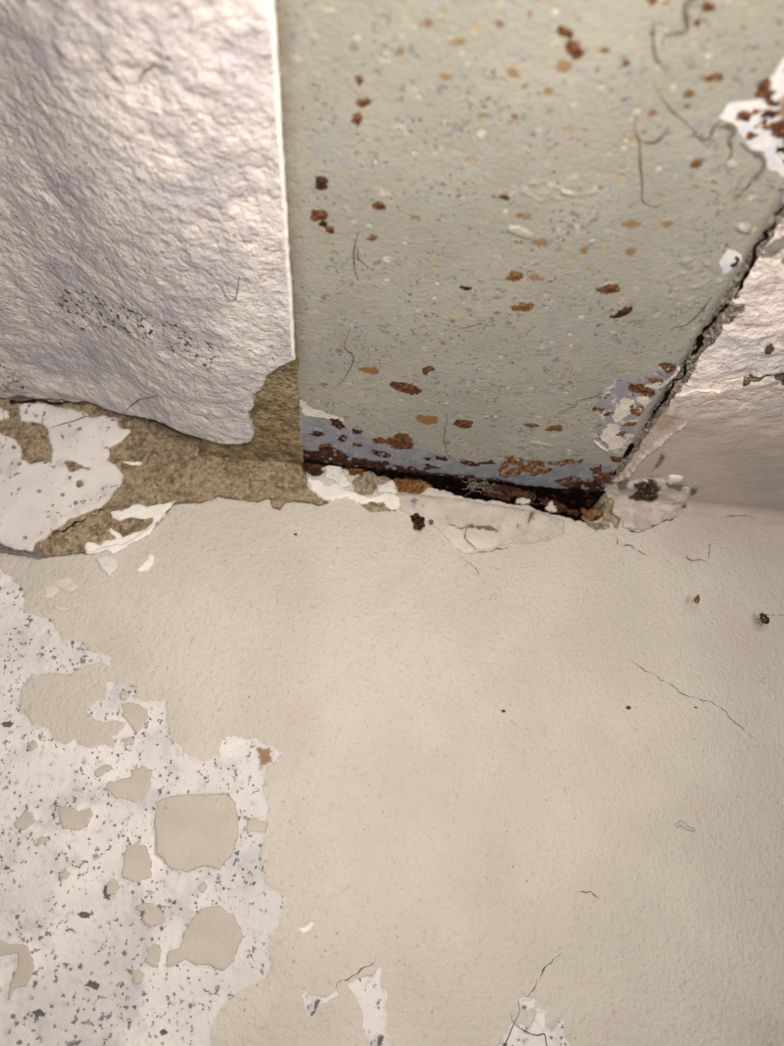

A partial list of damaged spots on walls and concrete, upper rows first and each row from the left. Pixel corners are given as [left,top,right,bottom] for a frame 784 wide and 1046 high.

corrosion [556,26,585,71]
corrosion [351,98,372,126]
corrosion [316,176,329,190]
corrosion [310,210,334,234]
corrosion [596,284,620,294]
corrosion [609,306,633,319]
crack [609,205,784,481]
spalling [0,347,687,578]
corrosion [300,447,623,517]
peeling [0,570,285,1046]
peeling [301,966,393,1046]
peeling [498,997,570,1046]